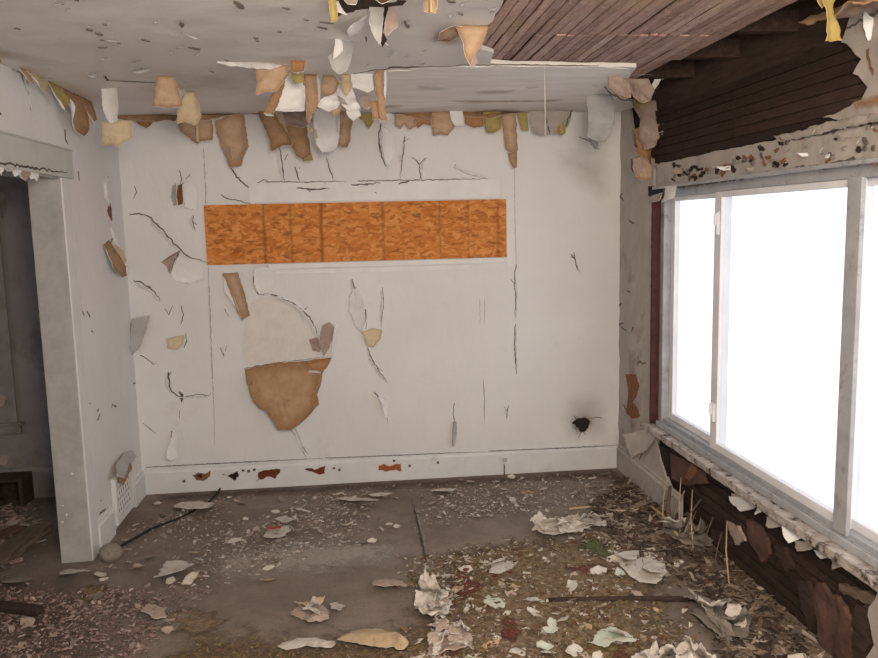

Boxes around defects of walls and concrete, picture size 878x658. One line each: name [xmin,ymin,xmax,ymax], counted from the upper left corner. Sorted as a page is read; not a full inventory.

flaking render [18,0,878,203]
crack [189,136,488,231]
crack [104,176,226,403]
crack [270,294,317,338]
crack [377,288,385,328]
crack [511,235,519,375]
peeling [222,266,338,455]
spalling [222,468,280,481]
spalling [379,460,411,472]
peeling [710,522,747,554]
peeling [729,493,841,571]
peeling [839,583,877,658]